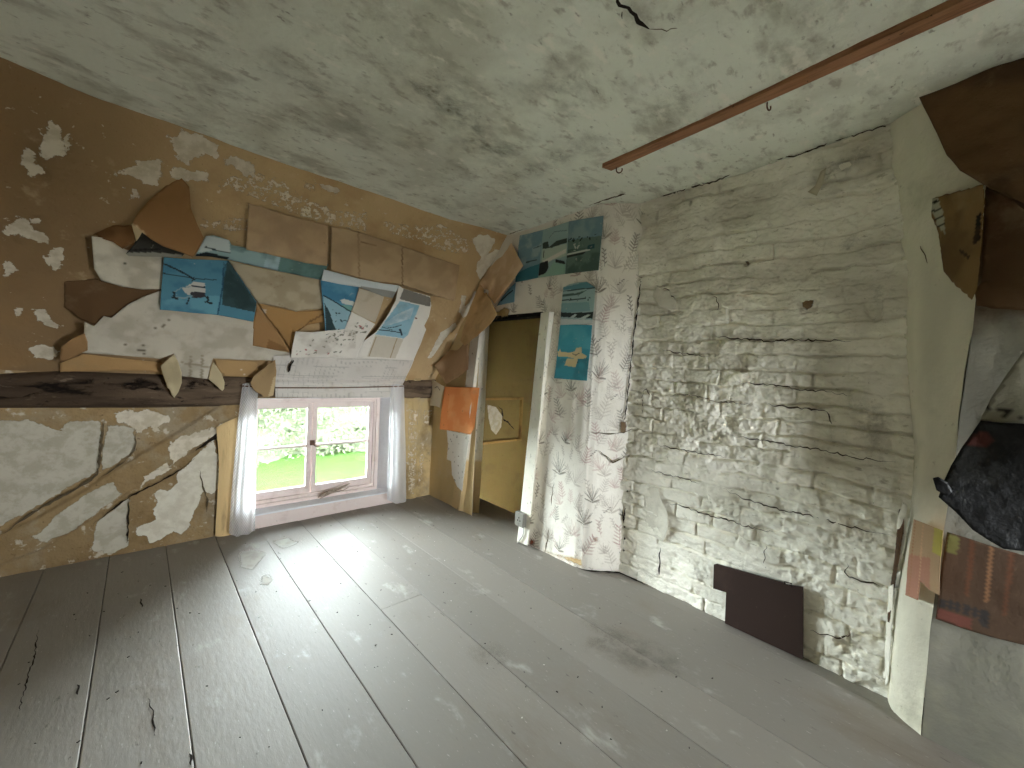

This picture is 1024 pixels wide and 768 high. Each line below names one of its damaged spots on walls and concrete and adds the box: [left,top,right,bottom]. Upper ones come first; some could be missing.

crack [616,0,677,32]
peeling [20,120,72,178]
crack [777,126,886,160]
peeling [114,128,366,231]
crack [663,175,729,196]
peeling [2,216,65,271]
peeling [14,308,59,329]
peeling [29,344,60,360]
crack [591,281,850,463]
flaking render [487,405,502,434]
flaking render [0,409,170,526]
flaking render [31,424,221,554]